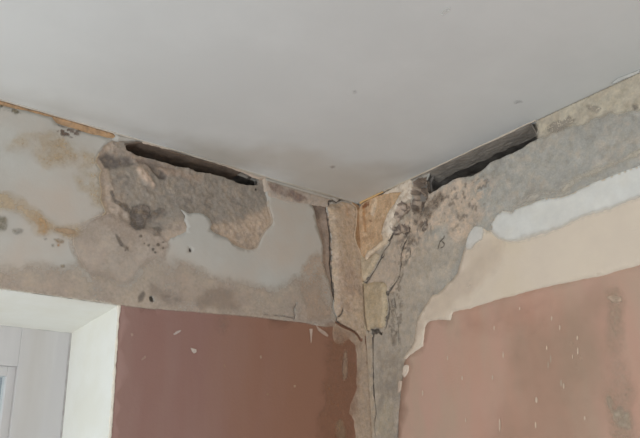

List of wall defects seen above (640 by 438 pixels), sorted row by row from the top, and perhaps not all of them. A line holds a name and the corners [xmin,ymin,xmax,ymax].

flaking render [0,101,273,284]
leakage [110,191,164,253]
leakage [0,257,334,327]
crack [325,199,346,327]
crack [362,233,411,329]
spalling [309,110,640,438]
crack [360,321,376,437]